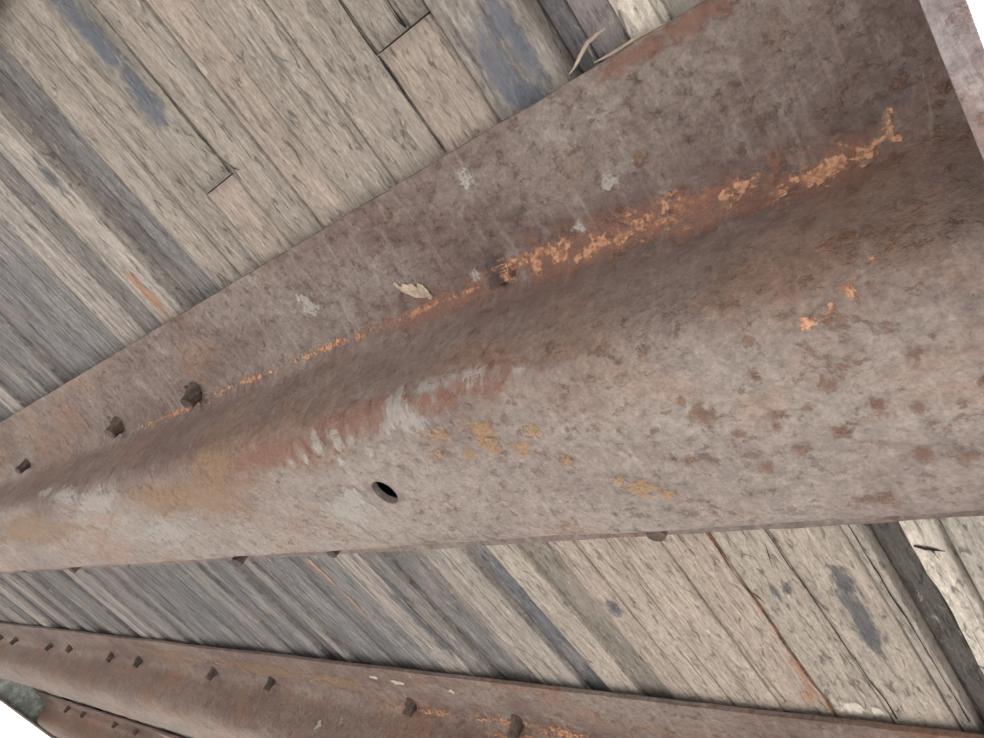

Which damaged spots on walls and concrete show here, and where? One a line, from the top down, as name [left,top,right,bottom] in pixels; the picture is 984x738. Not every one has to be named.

corrosion [768,107,903,204]
corrosion [491,173,762,282]
corrosion [290,286,479,364]
corrosion [800,316,816,331]
corrosion [142,368,280,429]
corrosion [519,721,588,738]